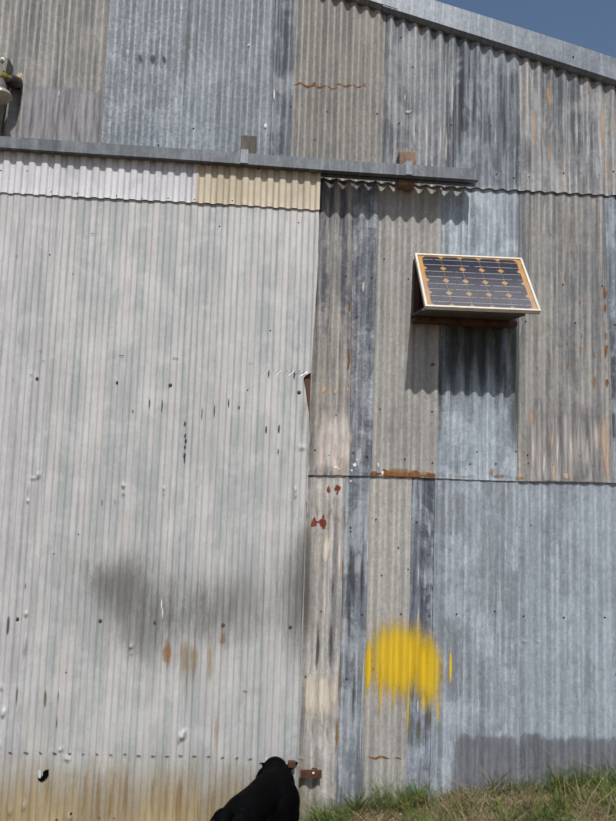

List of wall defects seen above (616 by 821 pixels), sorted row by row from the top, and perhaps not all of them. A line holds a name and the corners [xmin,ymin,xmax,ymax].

water stain [439,325,519,430]
corrosion [370,469,436,479]
water stain [530,402,609,483]